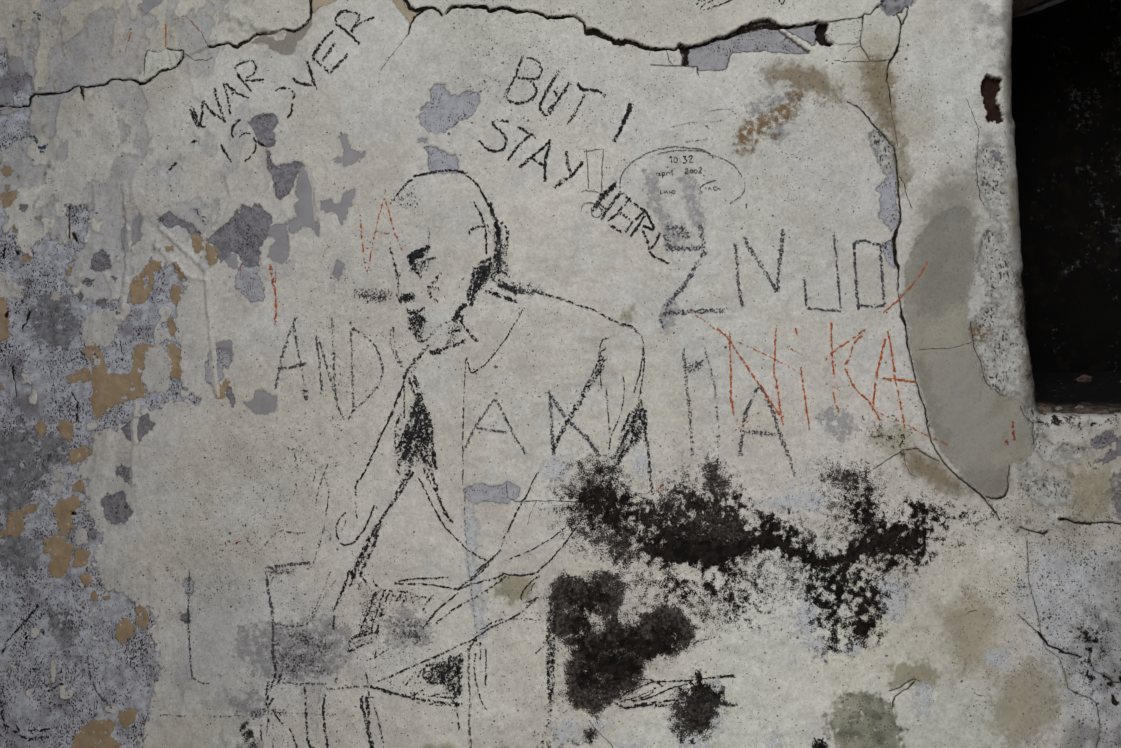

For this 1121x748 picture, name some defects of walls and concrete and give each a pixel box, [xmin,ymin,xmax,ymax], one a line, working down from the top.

crack [0,0,313,108]
peeling [250,0,336,55]
spalling [680,18,863,71]
spalling [878,0,914,16]
flaking render [416,84,480,174]
crack [68,207,78,242]
flaking render [157,113,355,303]
crack [5,309,31,329]
flaking render [0,49,277,748]
crack [380,0,1121,745]
spalling [1016,407,1121,519]
leakage [496,416,997,748]